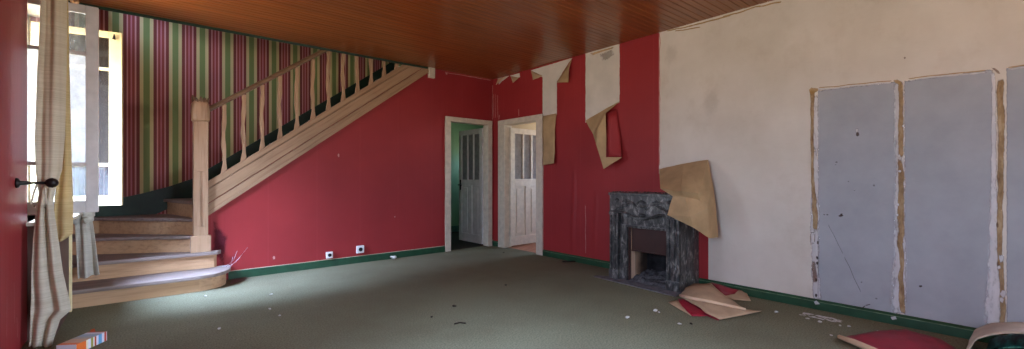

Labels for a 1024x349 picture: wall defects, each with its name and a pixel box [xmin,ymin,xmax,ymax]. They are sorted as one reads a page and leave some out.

flaking render [498,58,572,116]
flaking render [585,44,620,123]